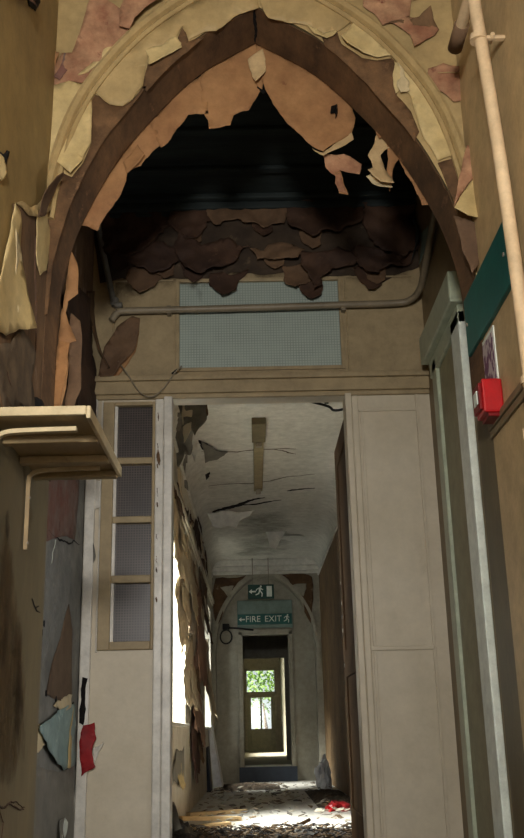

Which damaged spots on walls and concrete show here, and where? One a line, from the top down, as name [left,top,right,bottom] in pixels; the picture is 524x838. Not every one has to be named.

peeling [0,0,472,407]
crack [198,440,294,463]
crack [207,474,314,529]
leakage [0,513,24,773]
peeling [45,604,88,725]
crack [0,801,24,838]
peeling [33,766,75,838]